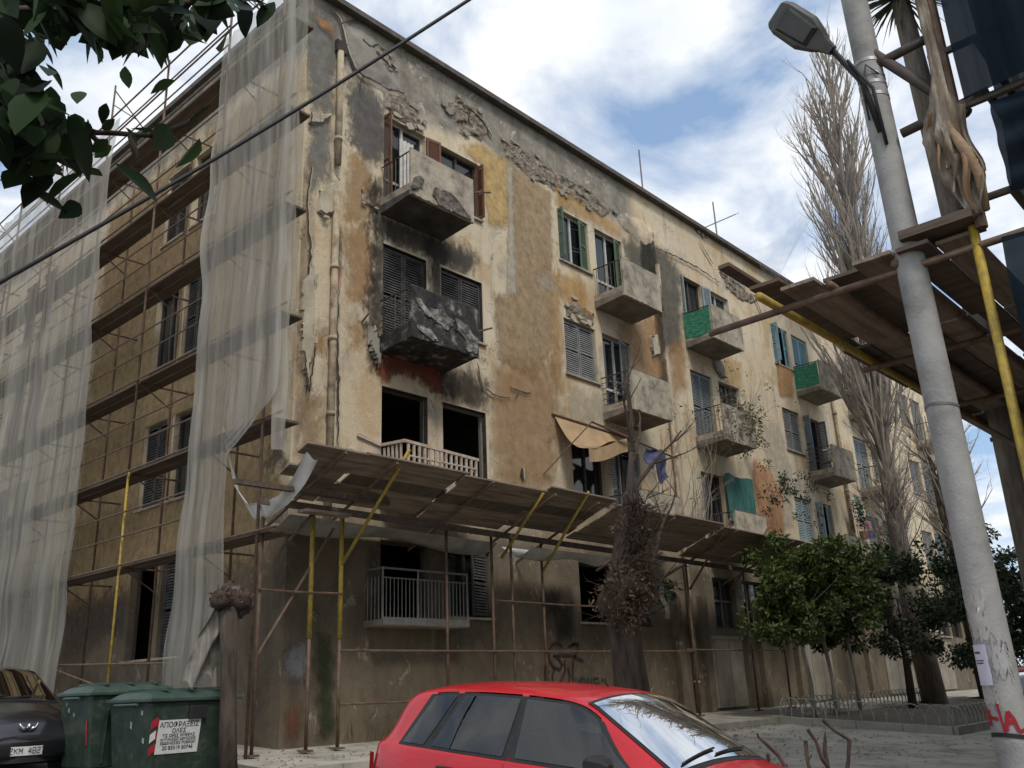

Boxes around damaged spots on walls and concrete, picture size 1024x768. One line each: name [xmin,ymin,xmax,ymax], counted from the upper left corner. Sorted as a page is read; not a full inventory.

flaking render [383,92,428,131]
flaking render [441,94,489,142]
crack [306,167,314,275]
spalling [410,175,472,220]
flaking render [501,136,618,295]
flaking render [298,263,319,393]
flaking render [367,325,442,392]
spalling [416,297,480,354]
flaking render [564,295,594,326]
flaking render [753,461,785,536]